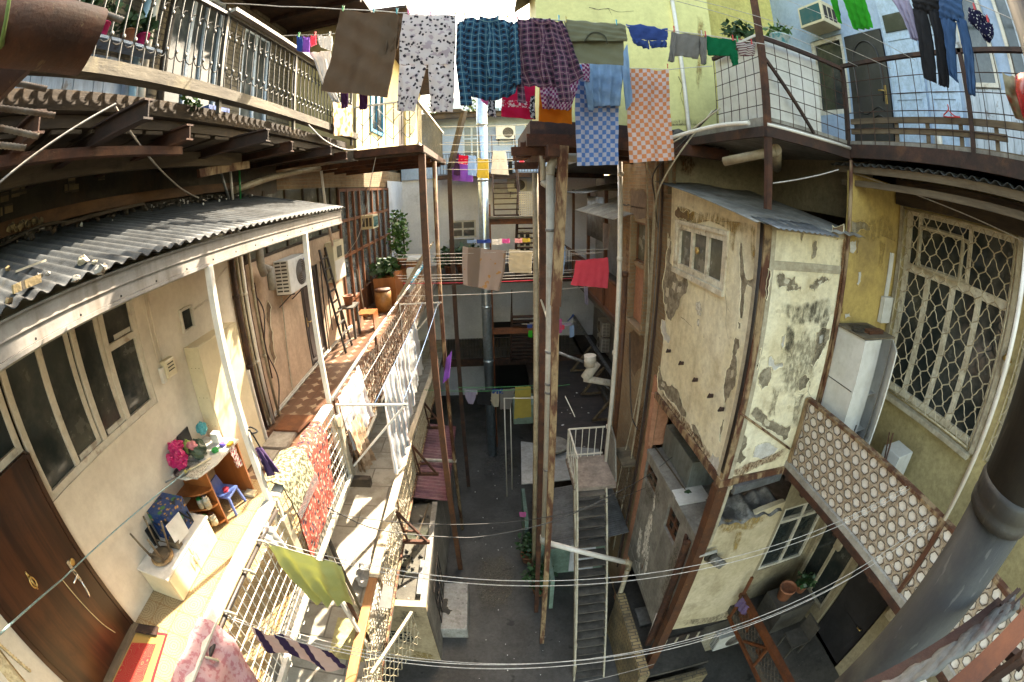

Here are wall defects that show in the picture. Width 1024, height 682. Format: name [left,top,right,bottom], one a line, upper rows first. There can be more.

flaking render [661,235,689,344]
flaking render [723,241,753,405]
flaking render [657,367,720,471]
flaking render [737,407,791,464]